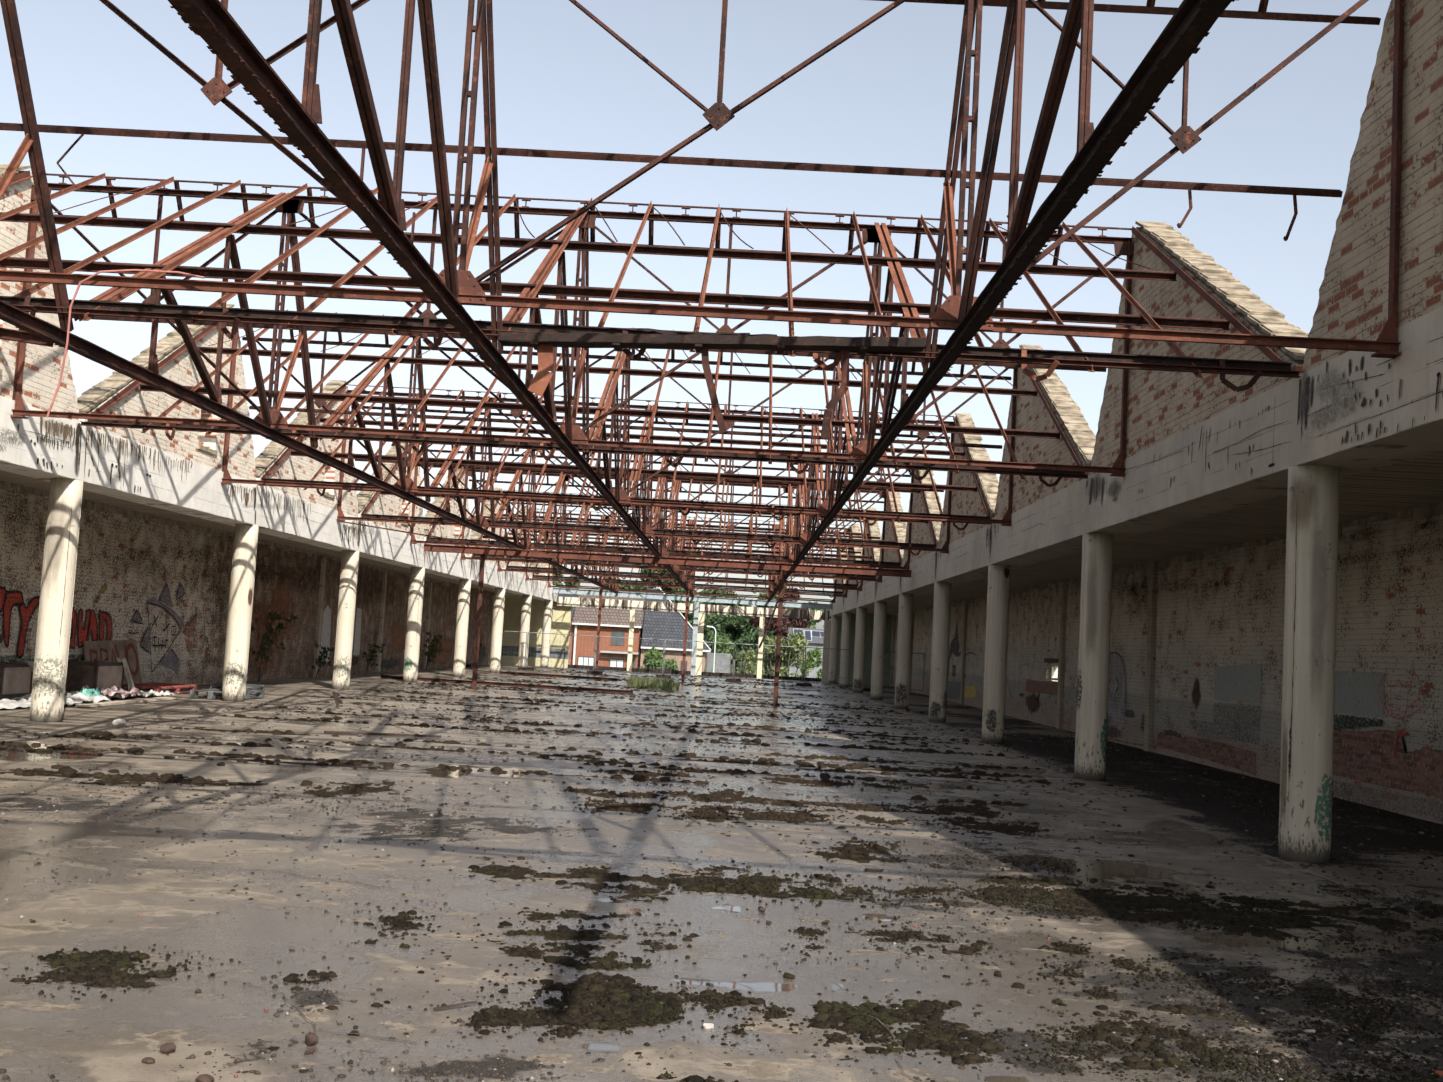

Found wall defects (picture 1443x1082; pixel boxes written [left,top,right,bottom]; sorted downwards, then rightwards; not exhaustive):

leakage [1297,357,1443,445]
leakage [37,417,192,493]
leakage [228,485,311,524]